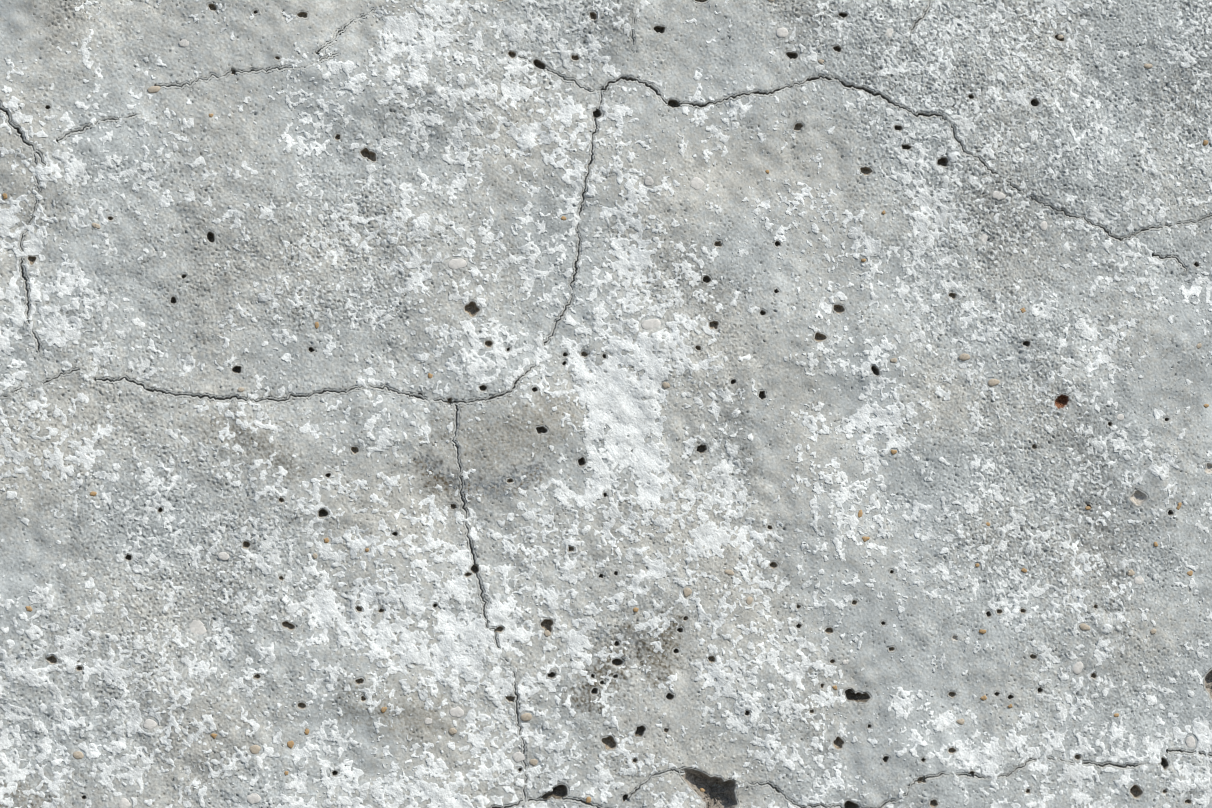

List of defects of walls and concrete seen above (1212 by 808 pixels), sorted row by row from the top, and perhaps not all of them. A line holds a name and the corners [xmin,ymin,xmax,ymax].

crack [156,0,399,89]
crack [517,54,533,64]
crack [901,0,932,52]
crack [57,112,143,143]
crack [679,62,1212,243]
crack [0,101,48,360]
crack [1152,253,1189,274]
crack [0,368,80,399]
crack [96,67,685,808]
crack [735,748,1212,808]